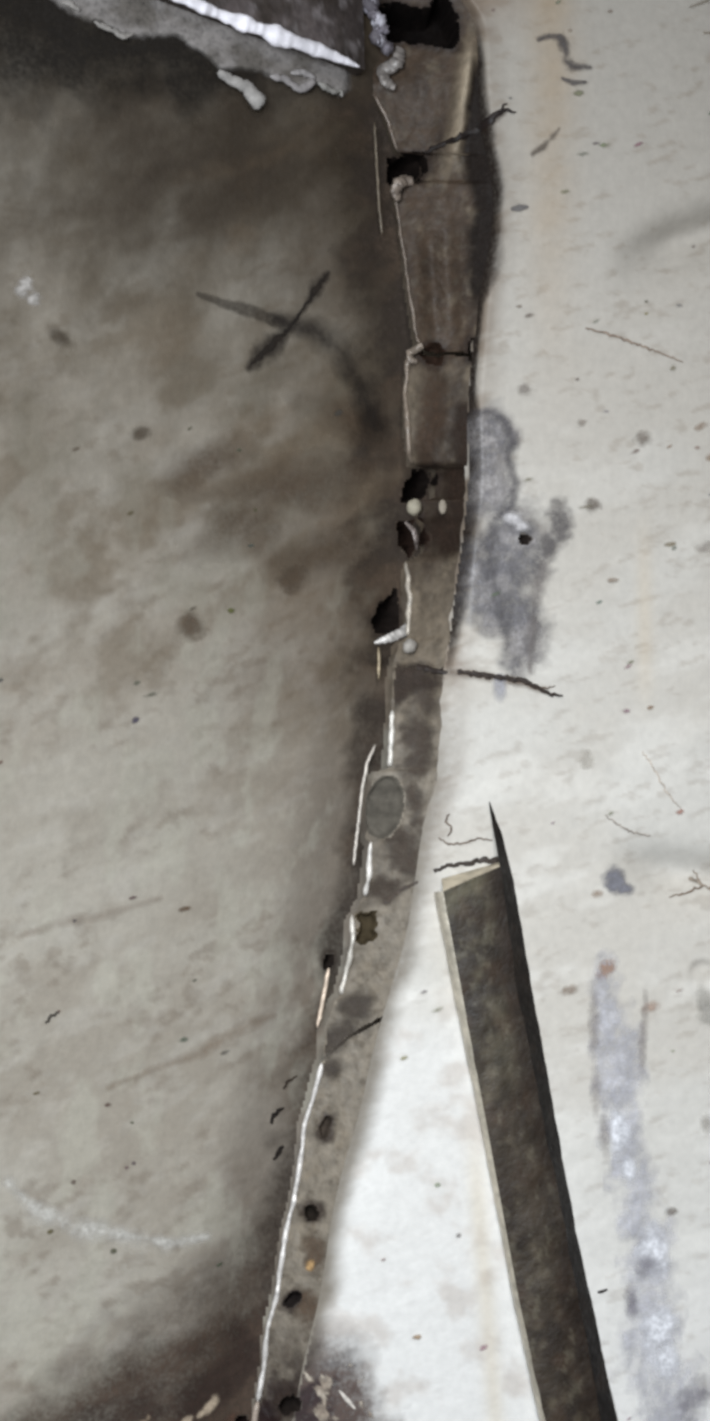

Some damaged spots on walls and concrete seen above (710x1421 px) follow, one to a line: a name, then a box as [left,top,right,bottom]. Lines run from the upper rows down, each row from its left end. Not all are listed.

peeling [374,624,407,645]
crack [416,664,563,697]
peeling [183,1396,218,1421]
peeling [304,1372,338,1421]